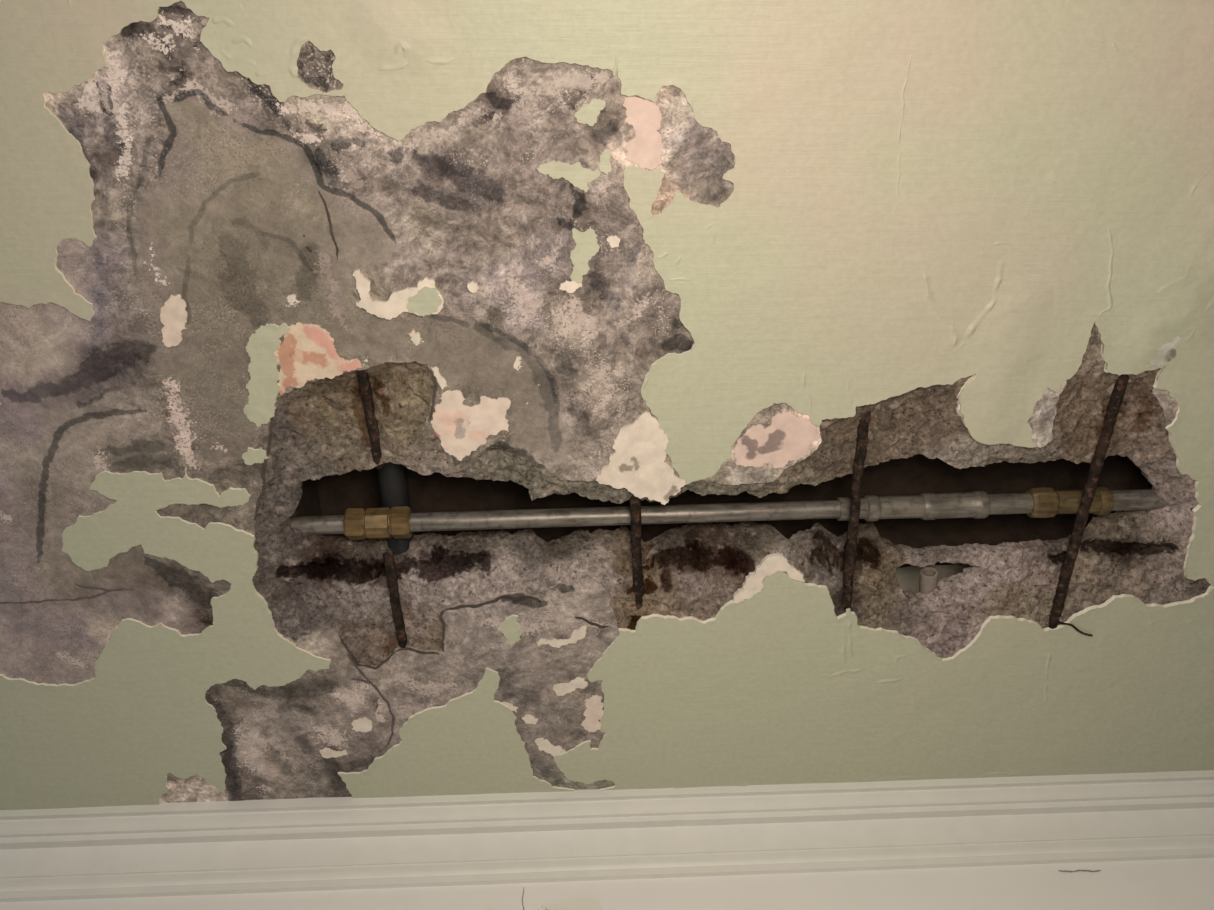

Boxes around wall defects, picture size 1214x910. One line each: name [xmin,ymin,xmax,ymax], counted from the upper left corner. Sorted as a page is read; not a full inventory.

peeling [0,1,1211,685]
spalling [159,370,848,803]
corrosion [627,540,755,595]
corrosion [810,530,881,575]
corrosion [1049,539,1178,564]